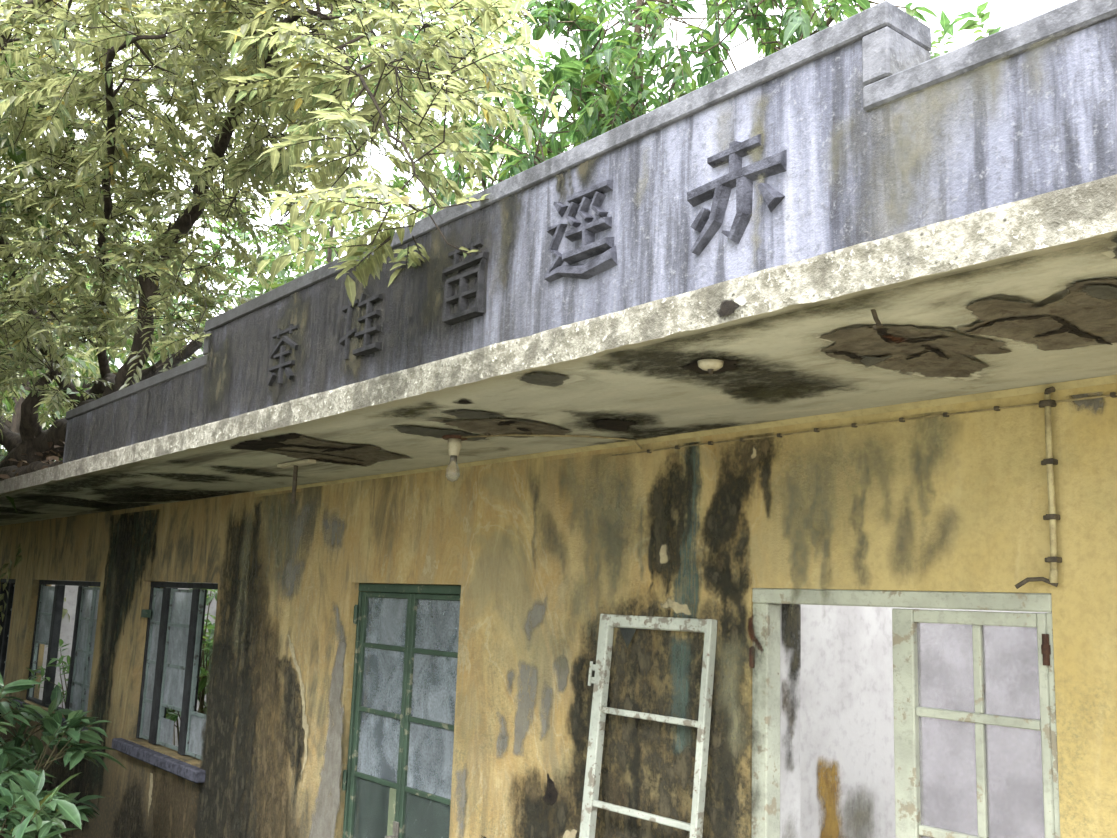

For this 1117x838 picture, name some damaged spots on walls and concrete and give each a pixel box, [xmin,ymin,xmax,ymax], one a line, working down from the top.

spalling [231,433,413,467]
spalling [394,400,572,441]
leakage [611,351,855,403]
spalling [819,280,1117,378]
leakage [0,460,297,838]
leakage [512,412,776,838]
leakage [782,452,869,733]